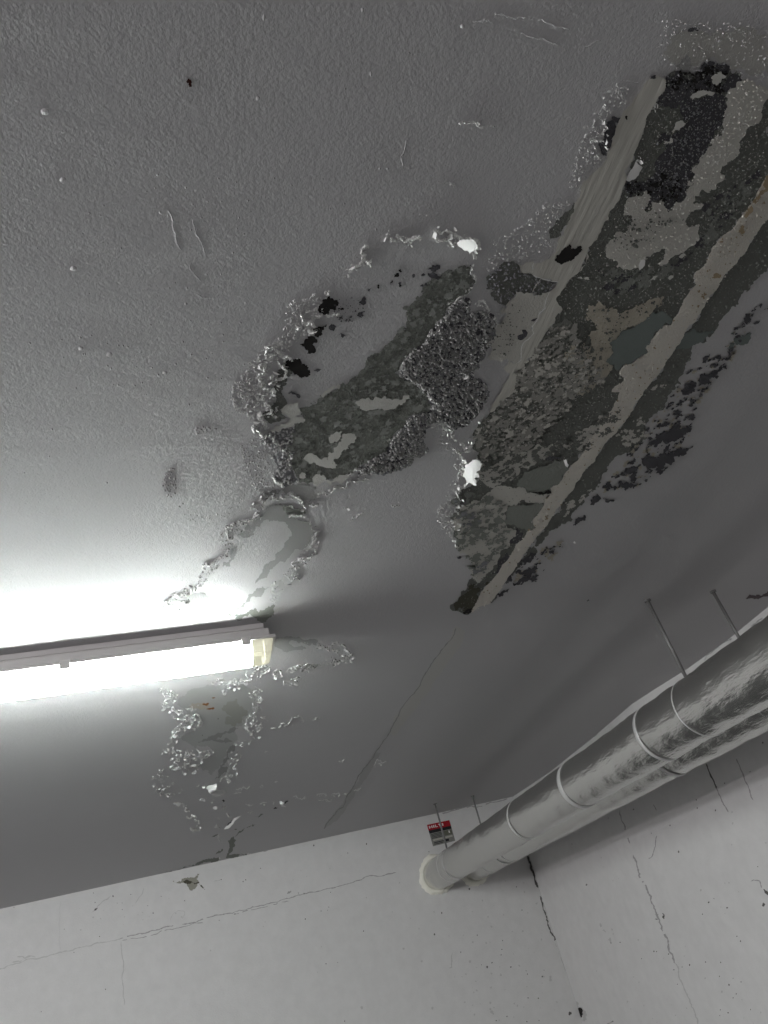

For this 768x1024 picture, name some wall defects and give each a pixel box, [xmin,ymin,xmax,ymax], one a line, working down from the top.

damp [614,26,768,250]
spalling [202,19,768,623]
damp [261,169,762,614]
peeling [162,583,210,615]
peeling [150,636,361,901]
crack [0,872,396,1005]
crack [527,856,565,970]
crack [619,812,698,1024]